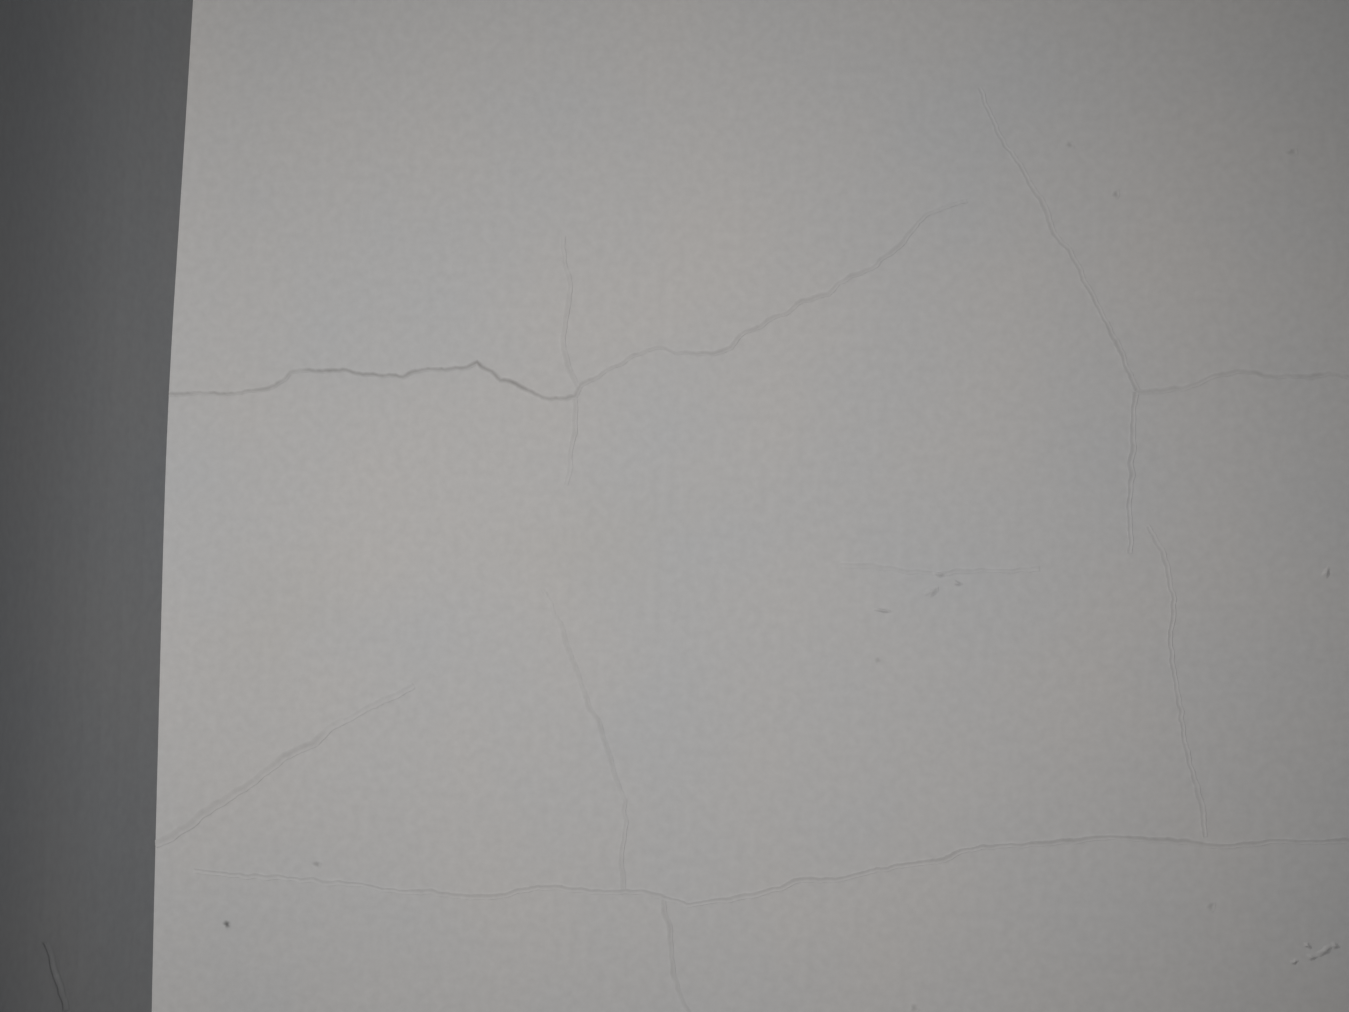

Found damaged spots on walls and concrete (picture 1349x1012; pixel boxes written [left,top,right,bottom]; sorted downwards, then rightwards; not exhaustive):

crack [169,199,967,485]